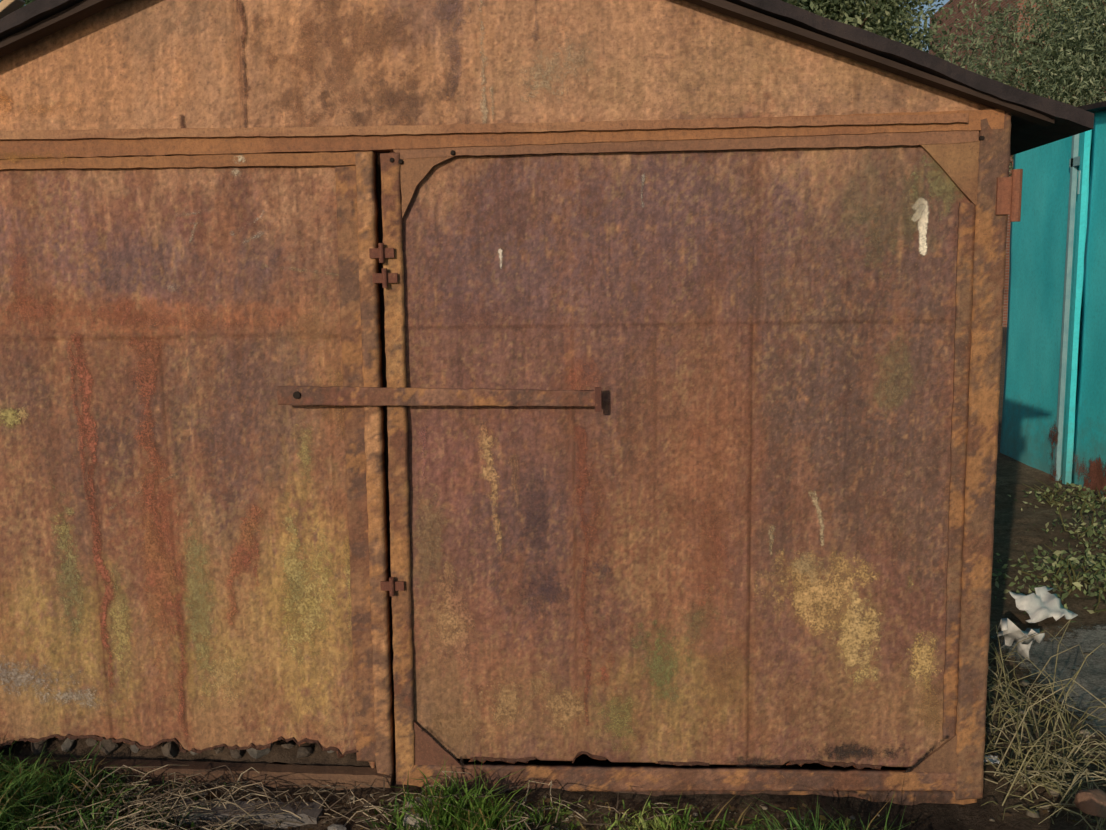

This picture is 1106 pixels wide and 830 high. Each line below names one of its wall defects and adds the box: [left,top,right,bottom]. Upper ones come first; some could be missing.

corrosion [238,1,247,128]
corrosion [478,425,502,552]
corrosion [1049,422,1058,482]
corrosion [1074,455,1106,498]